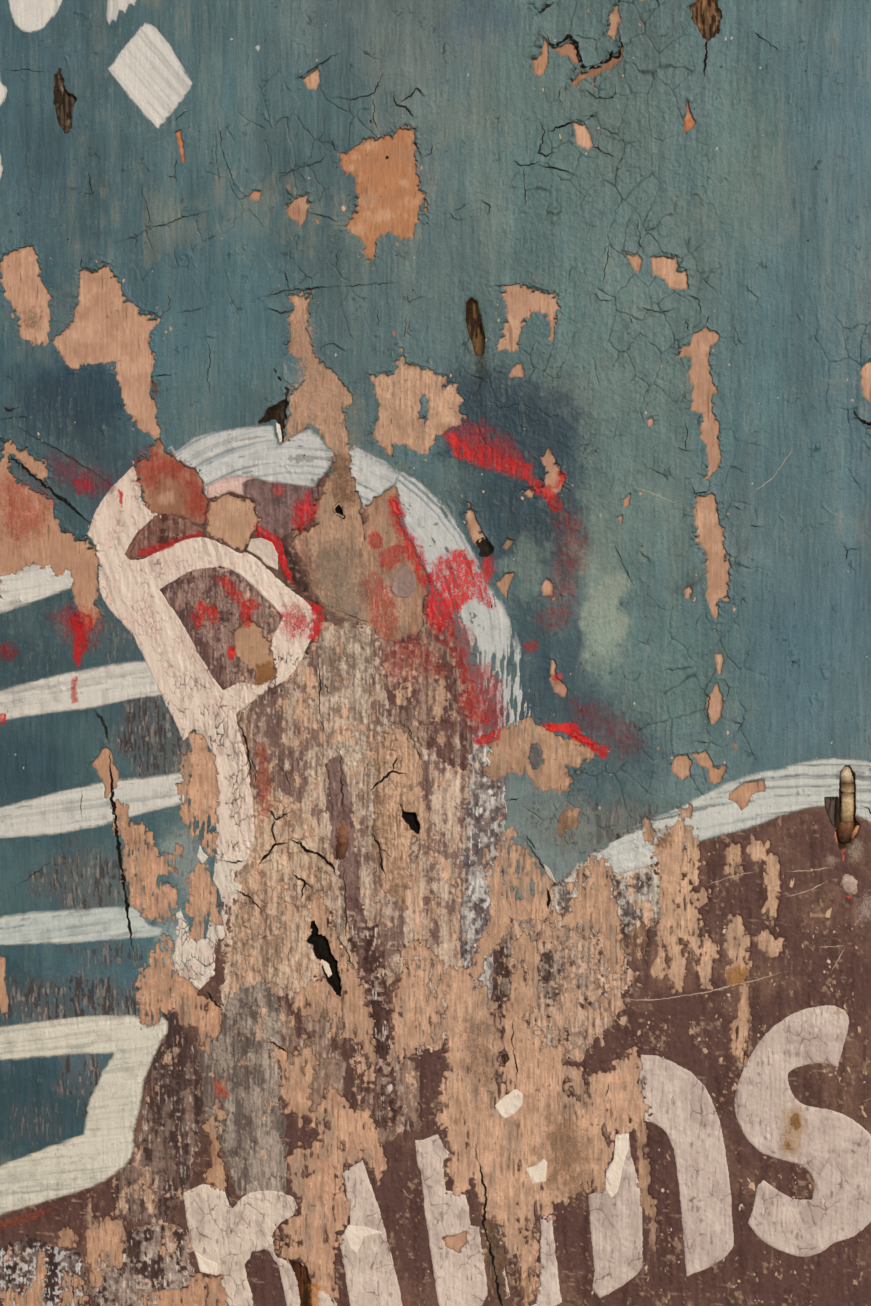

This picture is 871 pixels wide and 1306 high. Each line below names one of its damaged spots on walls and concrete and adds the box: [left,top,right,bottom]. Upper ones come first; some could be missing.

crack [701,36,709,77]
crack [345,74,433,156]
crack [513,4,623,208]
crack [141,157,198,229]
crack [218,130,249,199]
crack [279,141,335,220]
peeling [340,123,428,263]
crack [267,240,423,337]
crack [595,219,759,344]
crack [701,681,742,743]
peeling [0,246,785,1306]
crack [80,710,138,967]